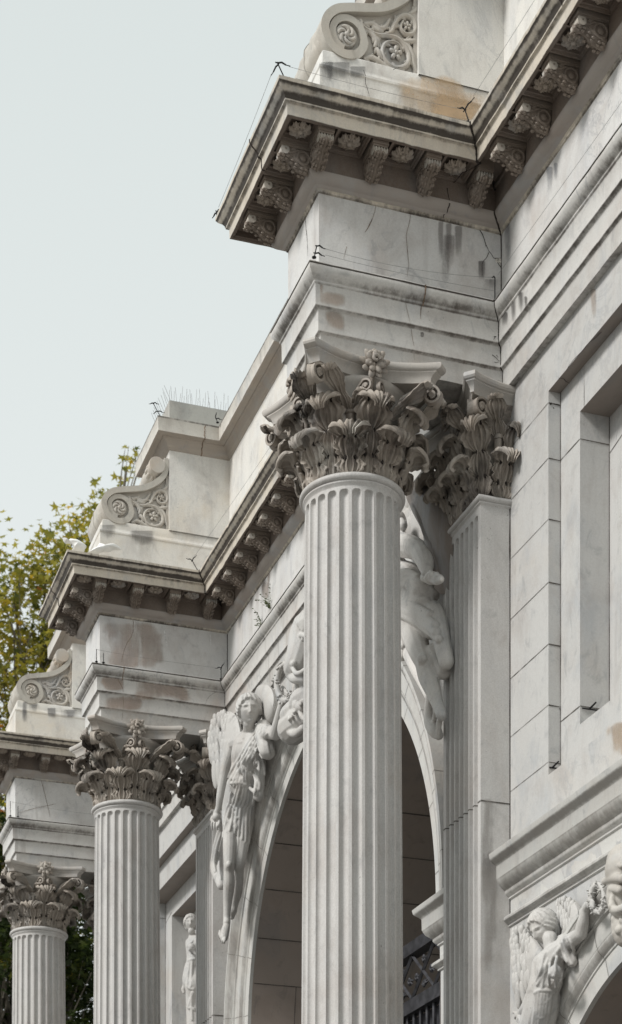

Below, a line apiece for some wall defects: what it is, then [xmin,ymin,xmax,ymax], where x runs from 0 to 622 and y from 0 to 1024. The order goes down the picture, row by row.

crack [406,214,427,344]
crack [443,121,503,383]